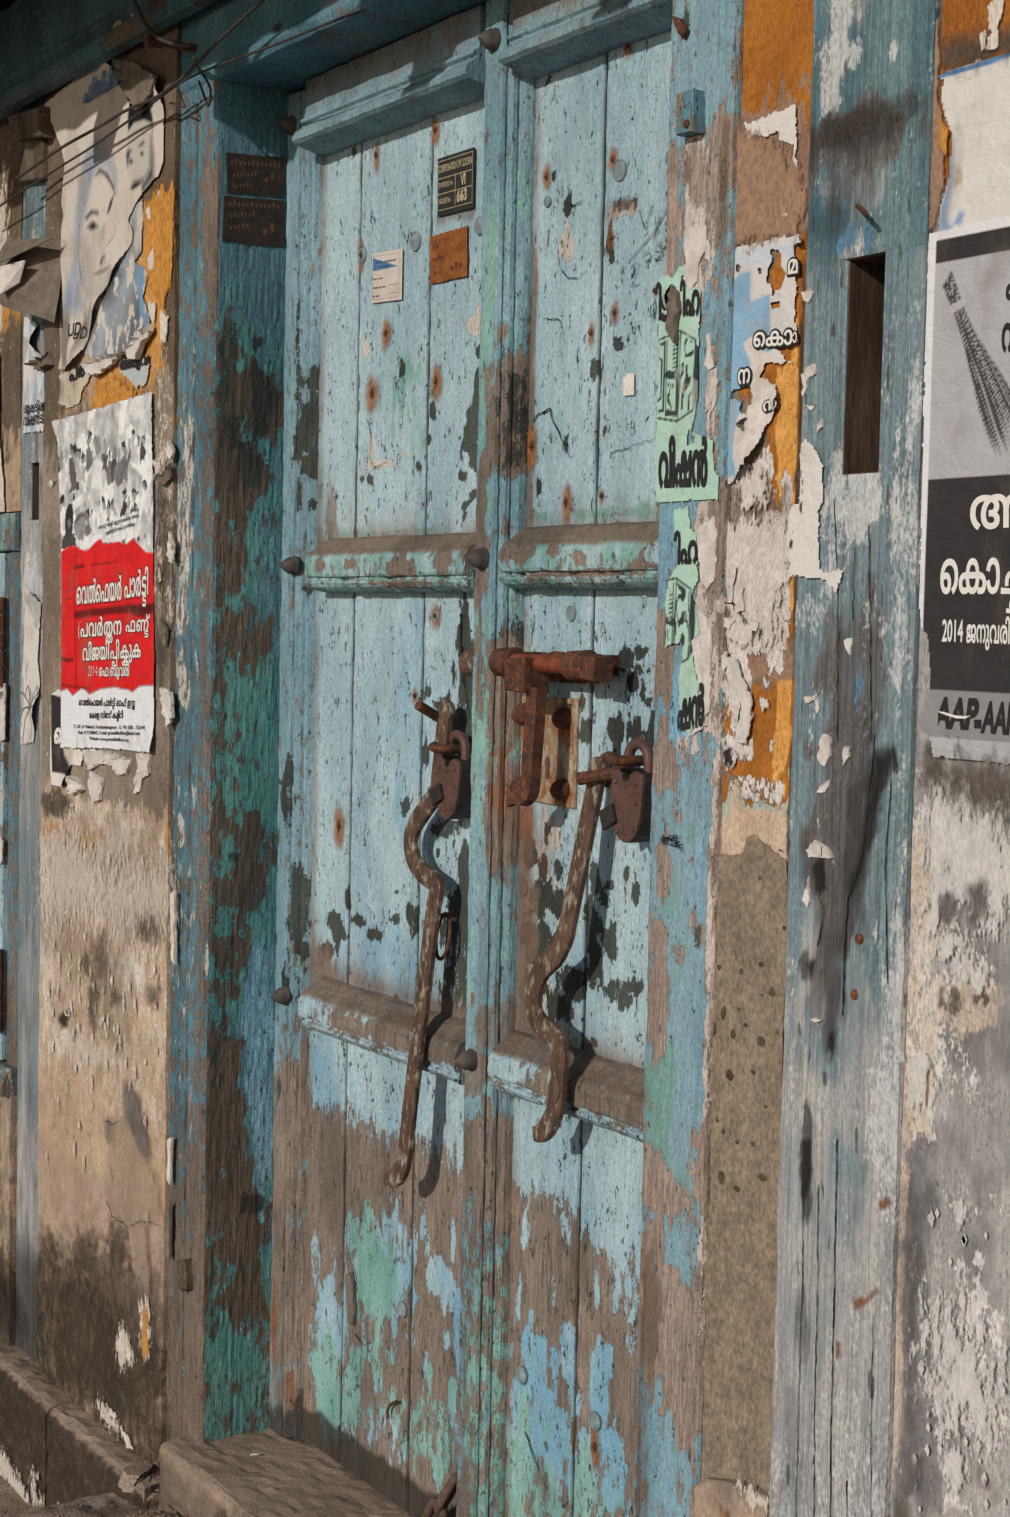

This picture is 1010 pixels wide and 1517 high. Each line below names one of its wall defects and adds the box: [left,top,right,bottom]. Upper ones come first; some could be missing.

peeling [979,0,1004,51]
peeling [735,128,807,254]
peeling [725,465,793,655]
peeling [721,679,769,770]
water stain [813,858,824,891]
water stain [849,747,895,891]
water stain [104,1083,149,1158]
water stain [801,1141,810,1197]
water stain [0,1220,166,1463]
peeling [905,1193,1010,1510]